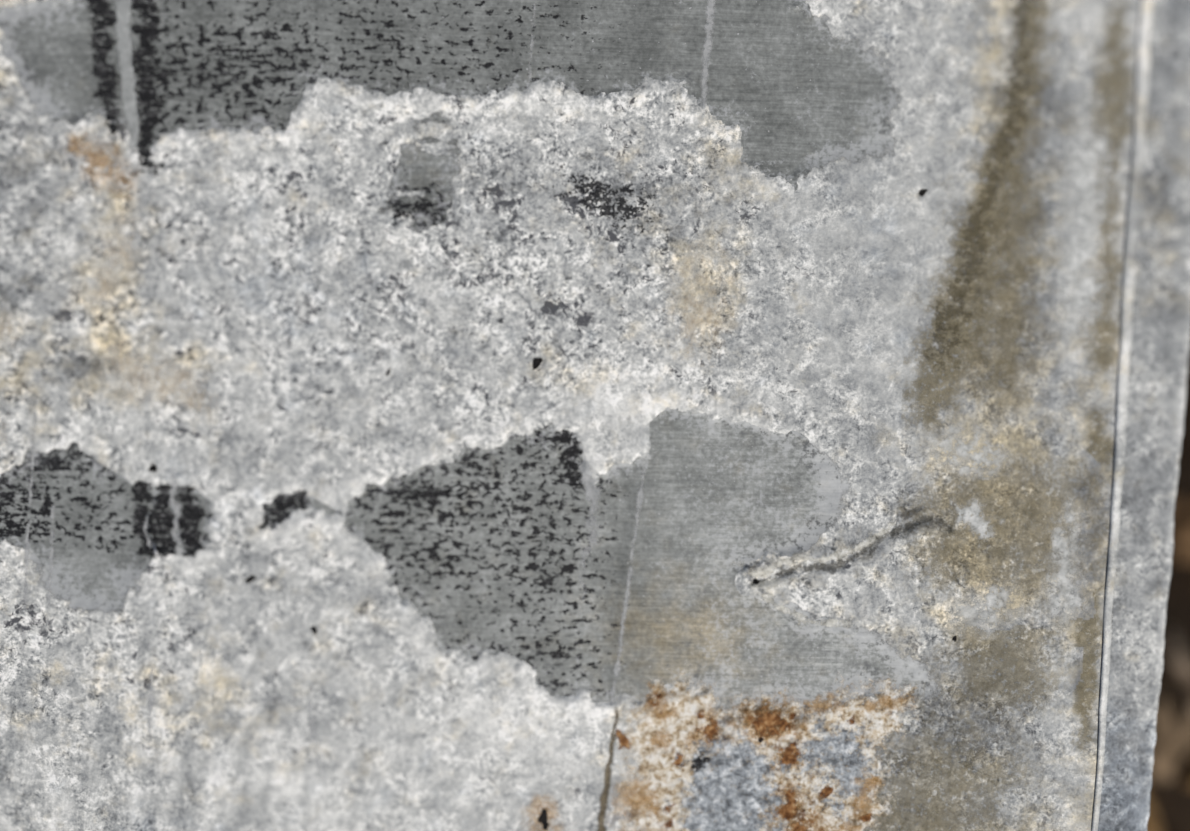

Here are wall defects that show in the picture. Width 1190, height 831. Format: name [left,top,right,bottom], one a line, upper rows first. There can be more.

peeling [378,111,461,232]
peeling [0,0,900,191]
damp [907,0,1044,423]
damp [1052,16,1131,370]
peeling [0,442,214,613]
peeling [256,407,943,720]
crack [742,515,951,628]
crack [598,711,618,831]
corrosion [614,669,918,831]